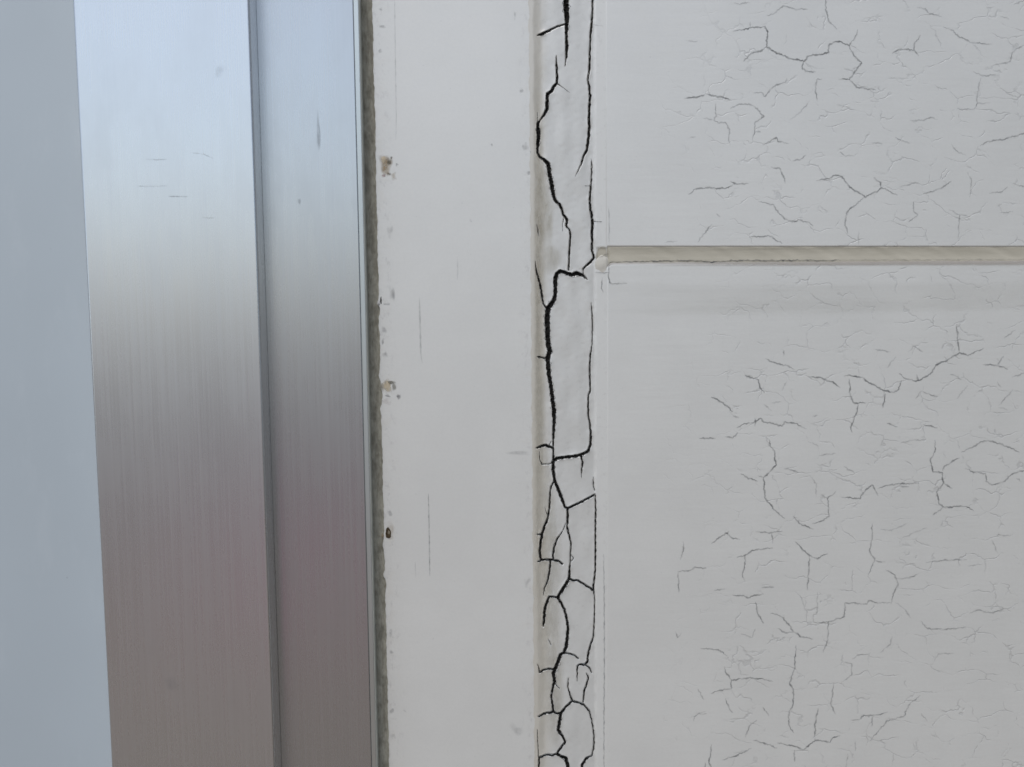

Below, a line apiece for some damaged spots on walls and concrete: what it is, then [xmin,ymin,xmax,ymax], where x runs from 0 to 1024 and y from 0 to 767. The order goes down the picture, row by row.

crack [535,0,834,767]